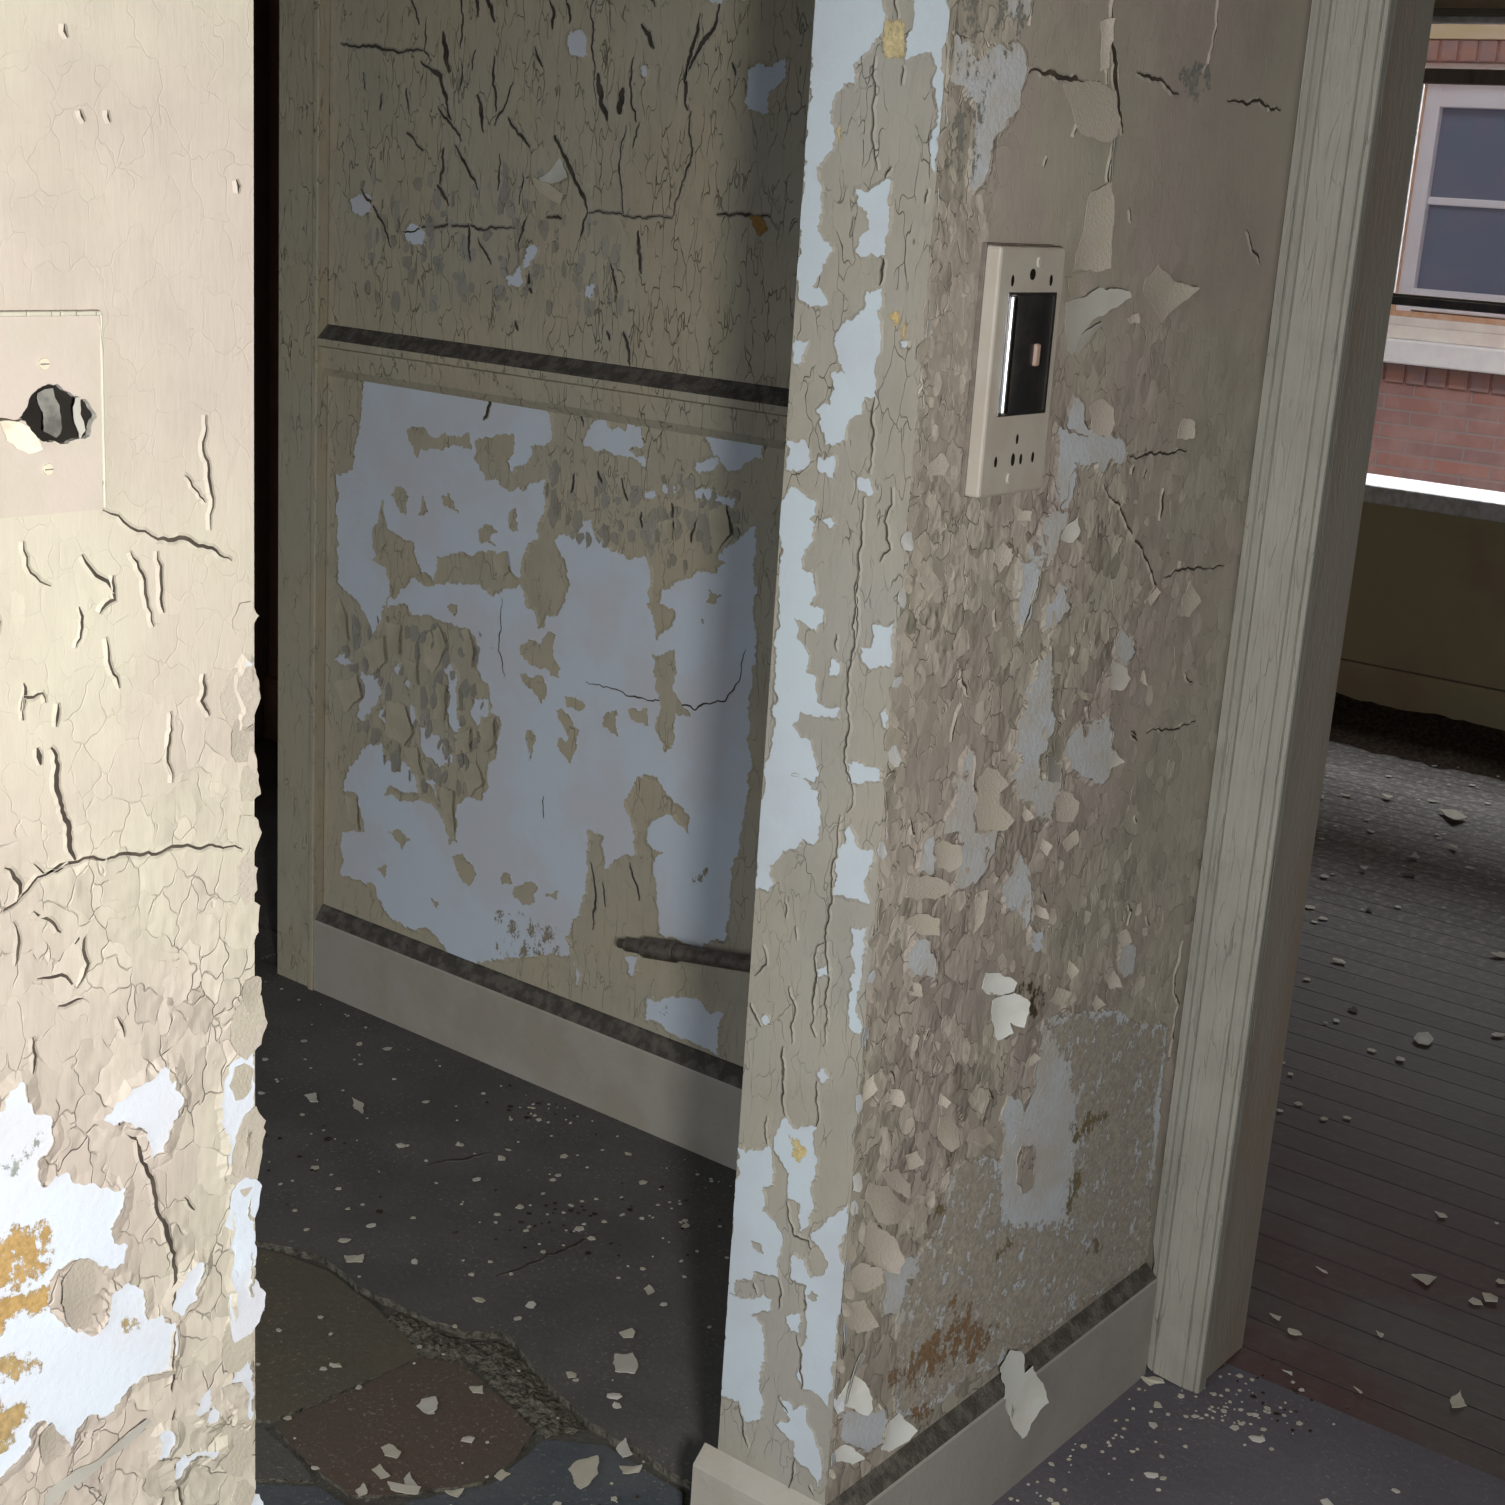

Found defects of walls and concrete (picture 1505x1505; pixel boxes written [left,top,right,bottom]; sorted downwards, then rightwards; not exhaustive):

crack [341,0,738,331]
crack [870,56,907,179]
crack [1029,0,1281,224]
crack [18,415,233,689]
crack [570,470,698,543]
crack [2,674,244,1075]
peeling [0,578,262,1169]
crack [590,861,642,931]
peeling [334,0,1202,1488]
peeling [0,976,268,1505]
crack [116,1122,196,1420]
crack [157,1464,184,1505]